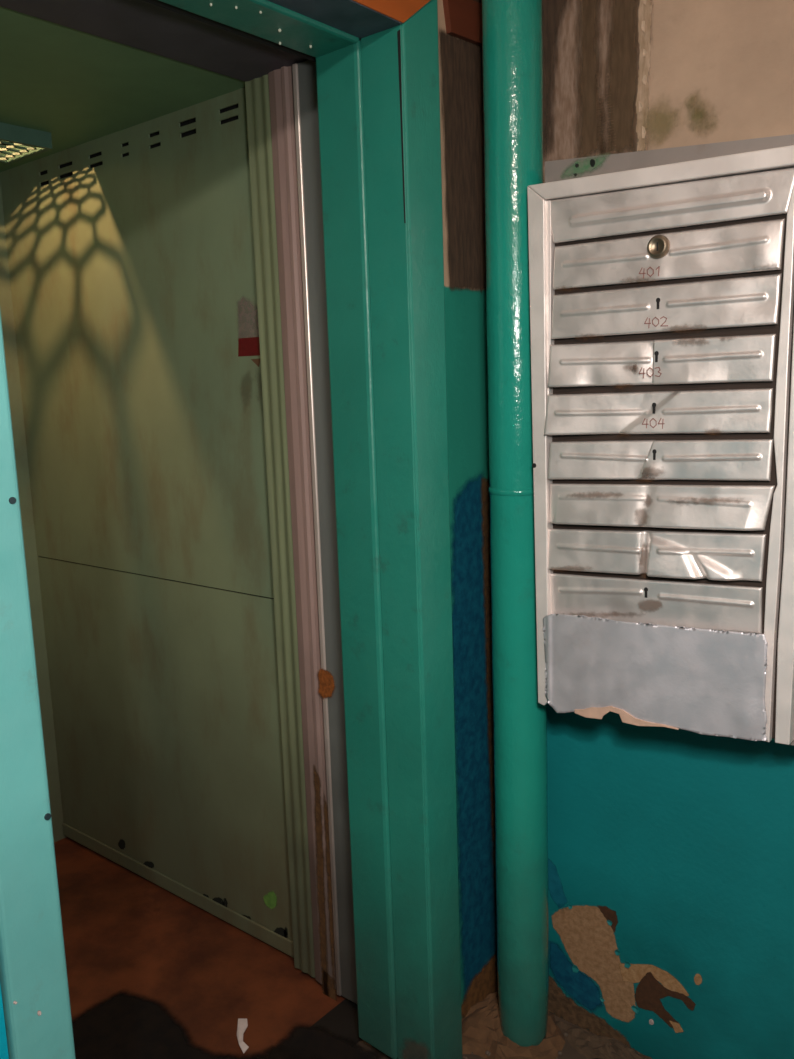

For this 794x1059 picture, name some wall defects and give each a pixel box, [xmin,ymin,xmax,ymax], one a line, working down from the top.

leakage [542,0,642,162]
corrosion [318,669,335,698]
peeling [548,904,702,1047]